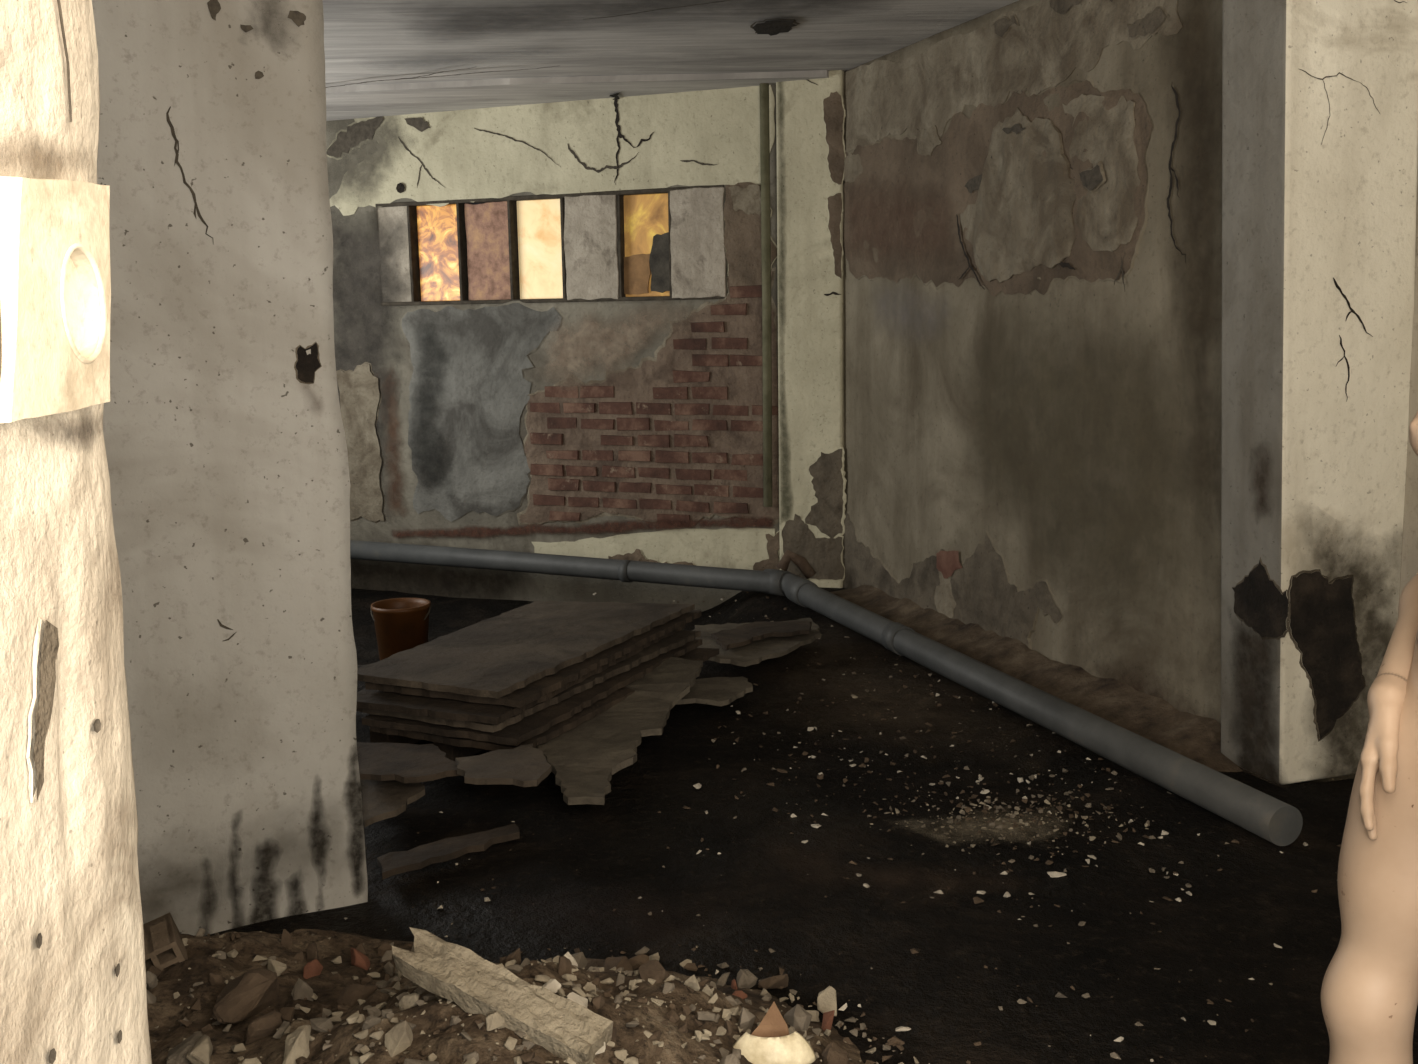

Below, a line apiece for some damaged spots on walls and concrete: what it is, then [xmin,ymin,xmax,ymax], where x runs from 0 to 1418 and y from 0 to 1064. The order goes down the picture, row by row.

crack [166,107,214,245]
crack [474,99,654,185]
peeling [822,0,1183,298]
crack [1300,69,1380,145]
leakage [414,334,442,484]
flaking render [326,85,1064,650]
crack [1333,278,1373,402]
flaking render [26,617,59,806]
spalling [1232,557,1364,742]
leakage [230,844,305,928]
leakage [311,802,327,866]
leakage [347,753,365,892]